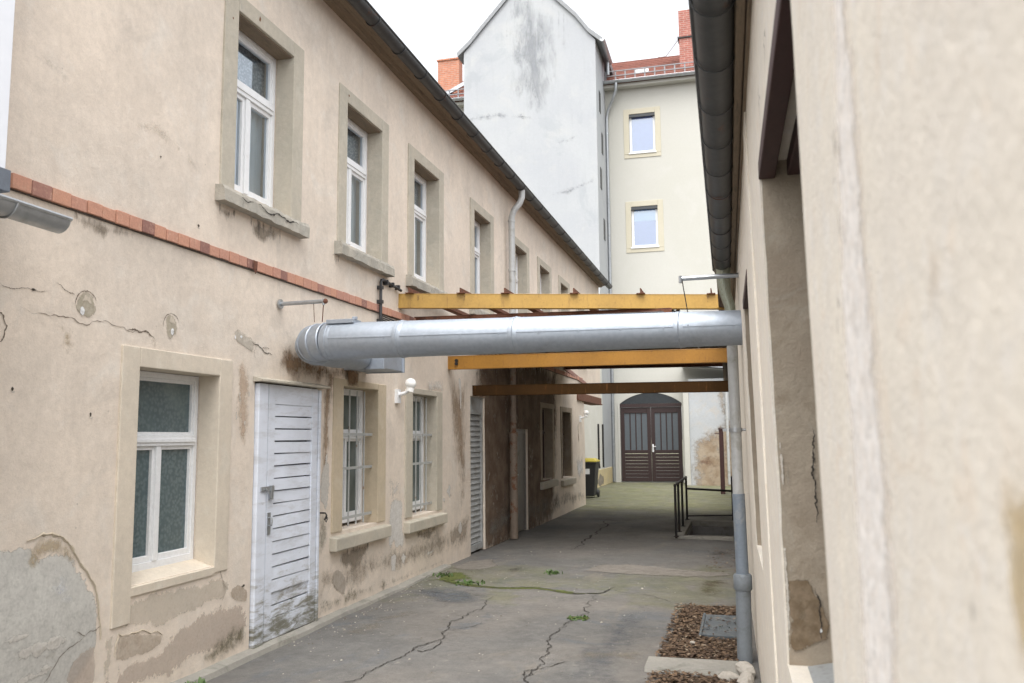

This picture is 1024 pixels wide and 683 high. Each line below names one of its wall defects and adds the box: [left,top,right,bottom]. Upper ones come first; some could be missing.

crack [242,197,299,225]
crack [0,284,154,342]
crack [811,428,819,522]
flaking render [0,532,101,683]
peeling [114,584,247,683]
crack [342,580,673,683]